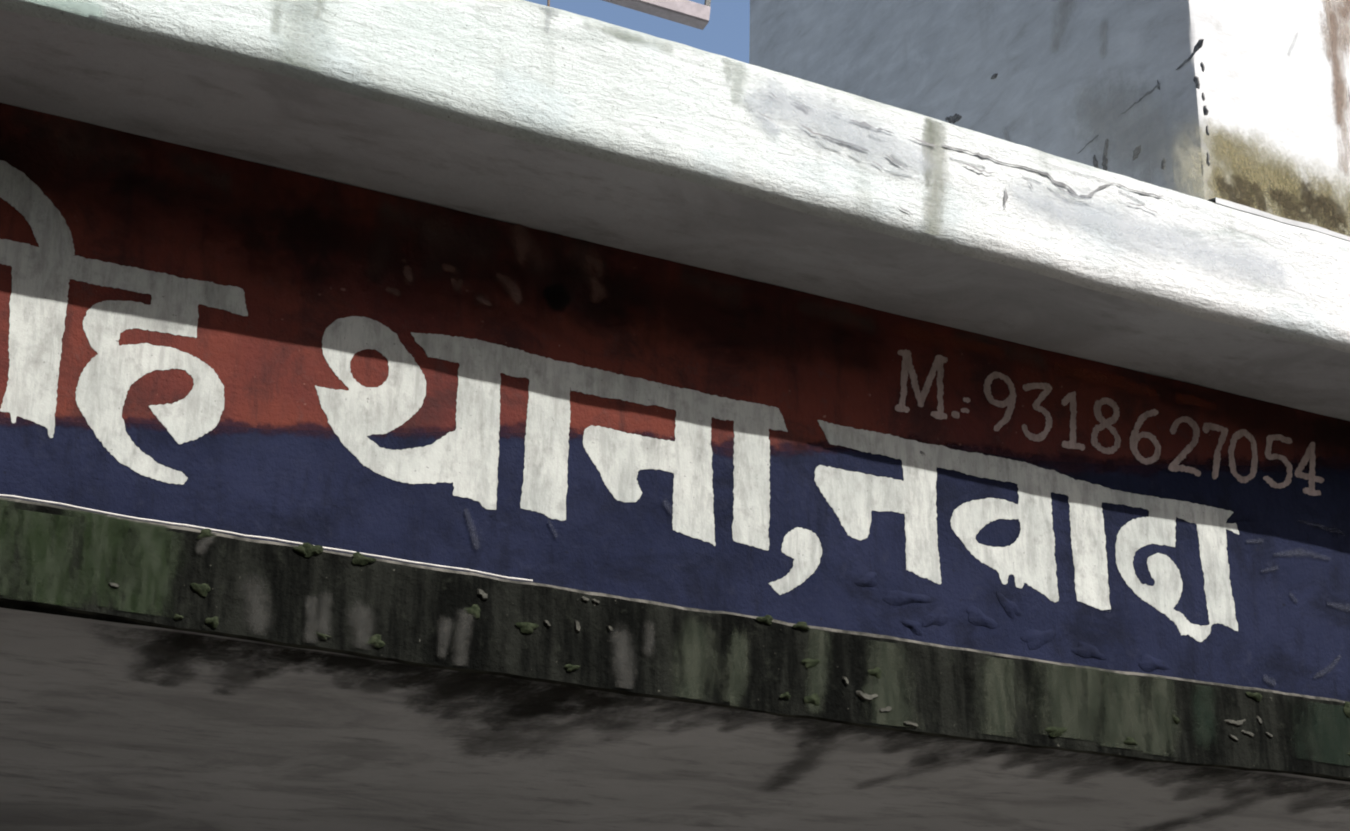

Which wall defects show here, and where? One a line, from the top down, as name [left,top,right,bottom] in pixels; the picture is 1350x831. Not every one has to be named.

rust [1325,0,1350,173]
crack [759,92,1164,214]
leakage [246,581,269,631]
leakage [306,595,329,641]
leakage [350,607,372,646]
leakage [438,612,472,666]
leakage [613,623,654,689]